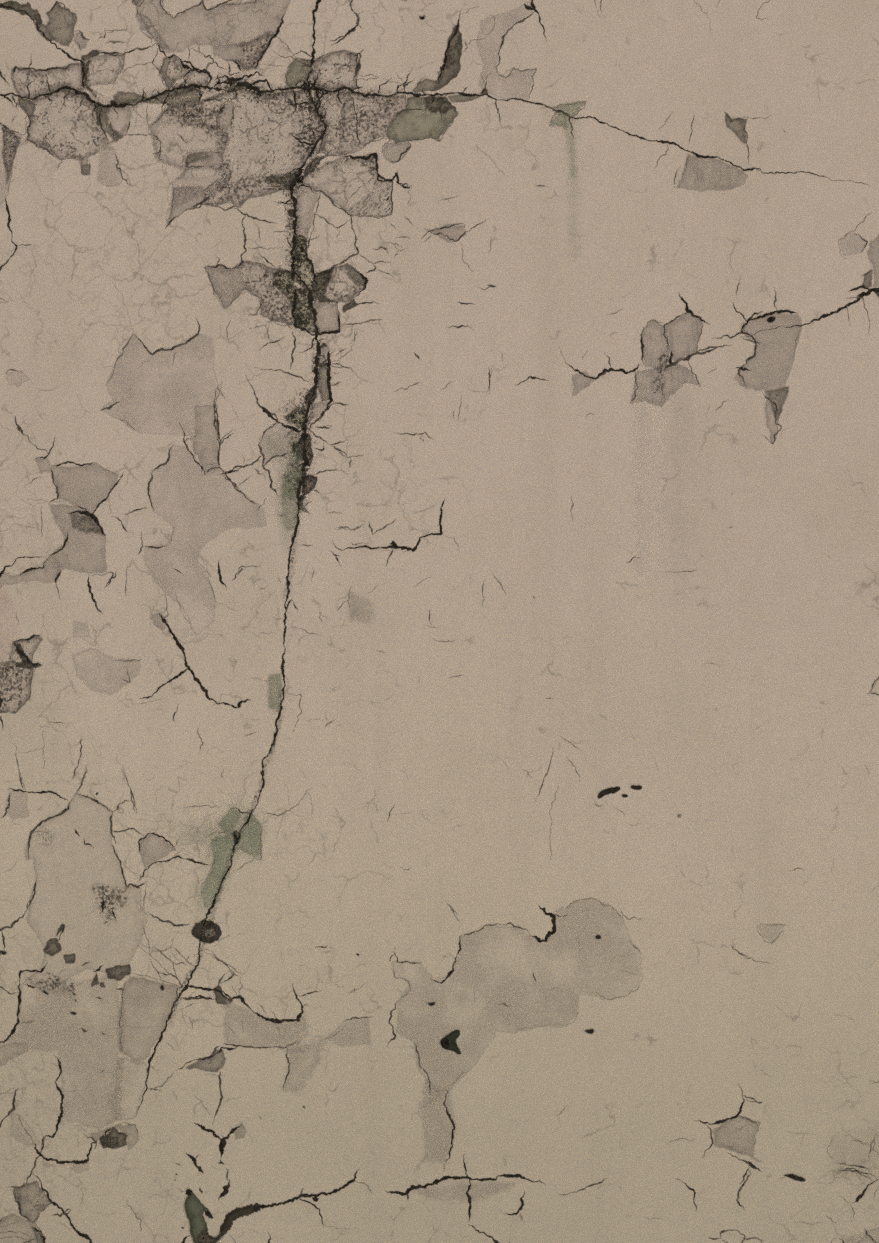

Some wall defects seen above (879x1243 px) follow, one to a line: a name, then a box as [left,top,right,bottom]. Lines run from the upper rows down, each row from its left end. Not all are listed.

crack [553,108,870,192]
flaking render [0,0,486,635]
crack [397,288,878,442]
peeling [630,295,721,406]
peeling [733,289,802,444]
crack [0,0,547,1117]
flaking render [0,617,42,728]
crack [0,899,98,1243]
peeling [0,772,246,1243]
peeling [387,897,642,1161]
crack [220,1154,607,1243]
crack [708,1230,764,1243]